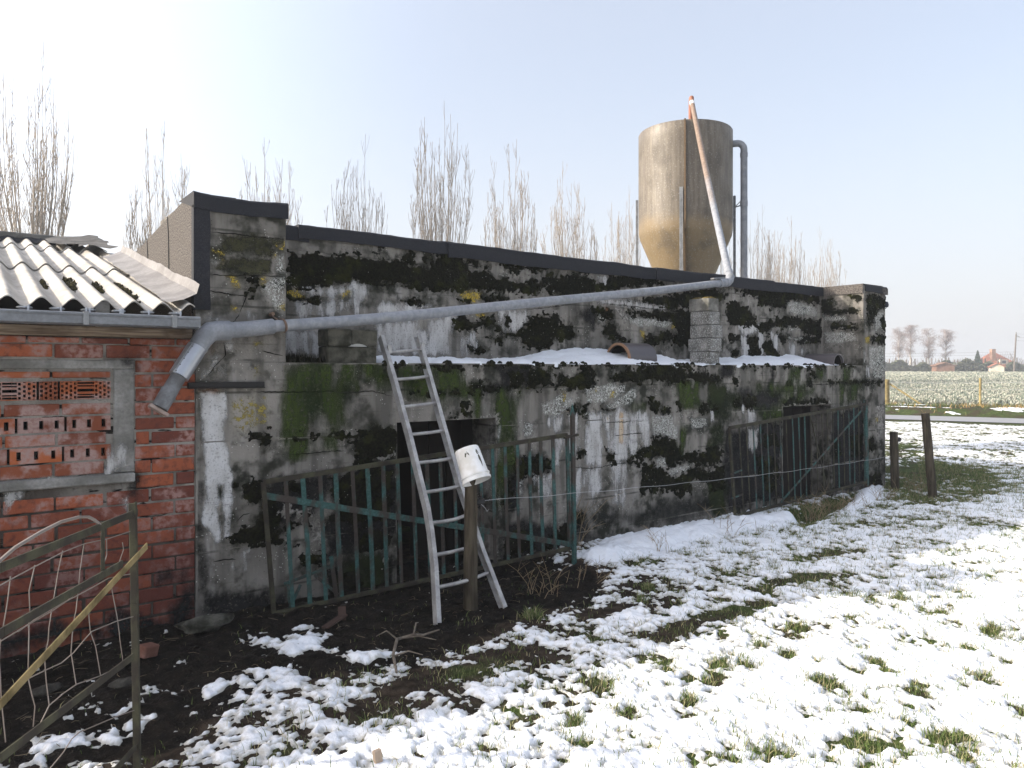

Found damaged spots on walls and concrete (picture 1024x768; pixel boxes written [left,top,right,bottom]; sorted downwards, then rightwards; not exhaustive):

damp [296,281,367,318]
damp [198,391,233,542]
damp [501,408,715,560]